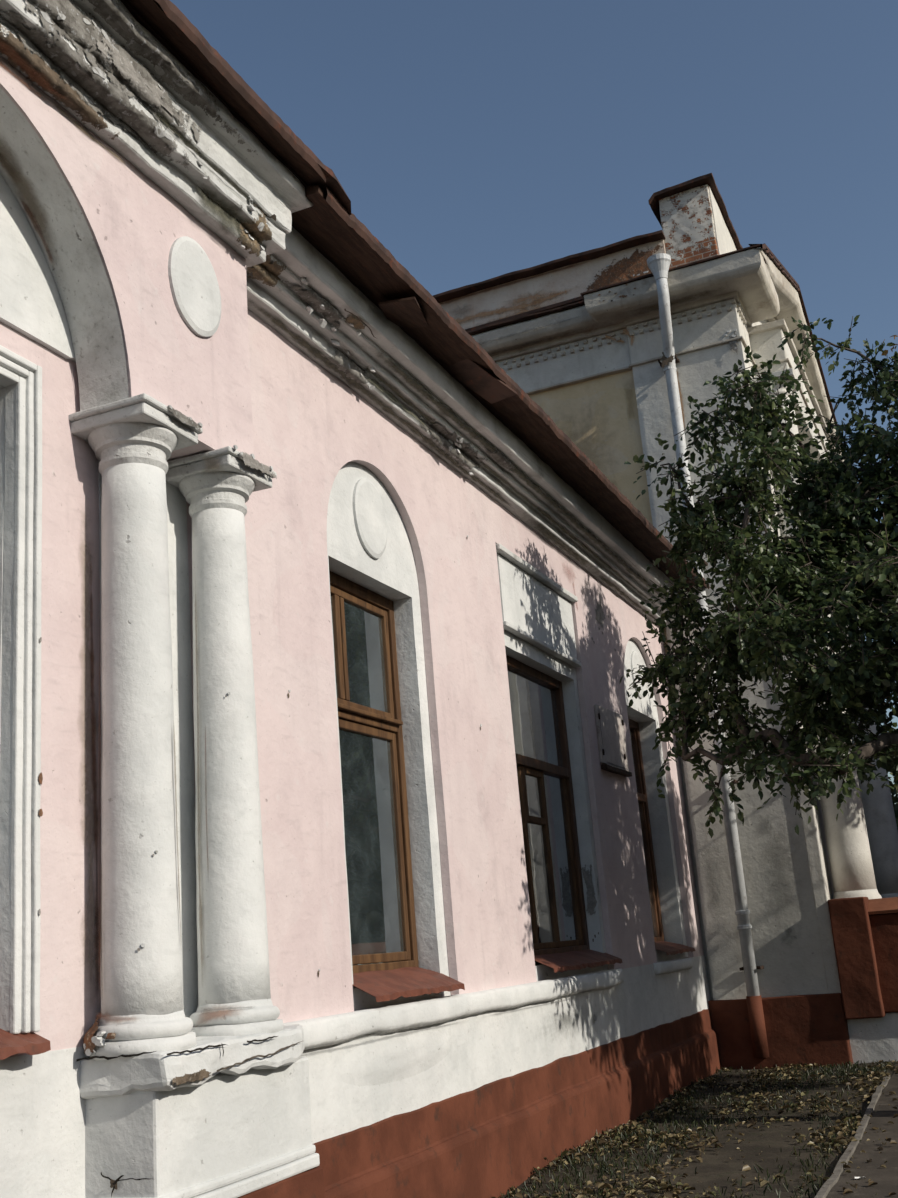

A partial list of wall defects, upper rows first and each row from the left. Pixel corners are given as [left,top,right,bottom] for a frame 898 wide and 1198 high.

spalling [0,0,258,180]
spalling [236,196,376,346]
flaking render [587,241,666,302]
crack [76,1036,278,1062]
crack [101,1172,148,1197]